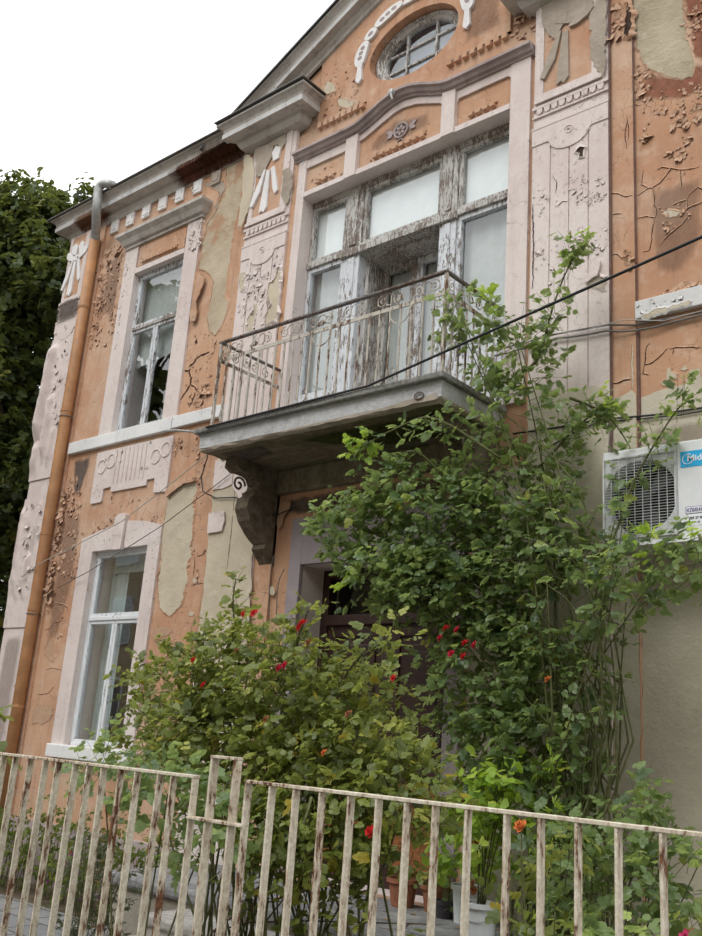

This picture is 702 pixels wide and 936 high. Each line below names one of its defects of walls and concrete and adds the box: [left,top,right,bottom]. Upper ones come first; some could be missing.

flaking render [510,0,702,164]
peeling [89,244,128,355]
crack [180,351,209,407]
flaking render [185,134,286,410]
crack [611,166,702,259]
flaking render [636,280,702,320]
peeling [43,475,147,651]
flaking render [139,435,253,672]